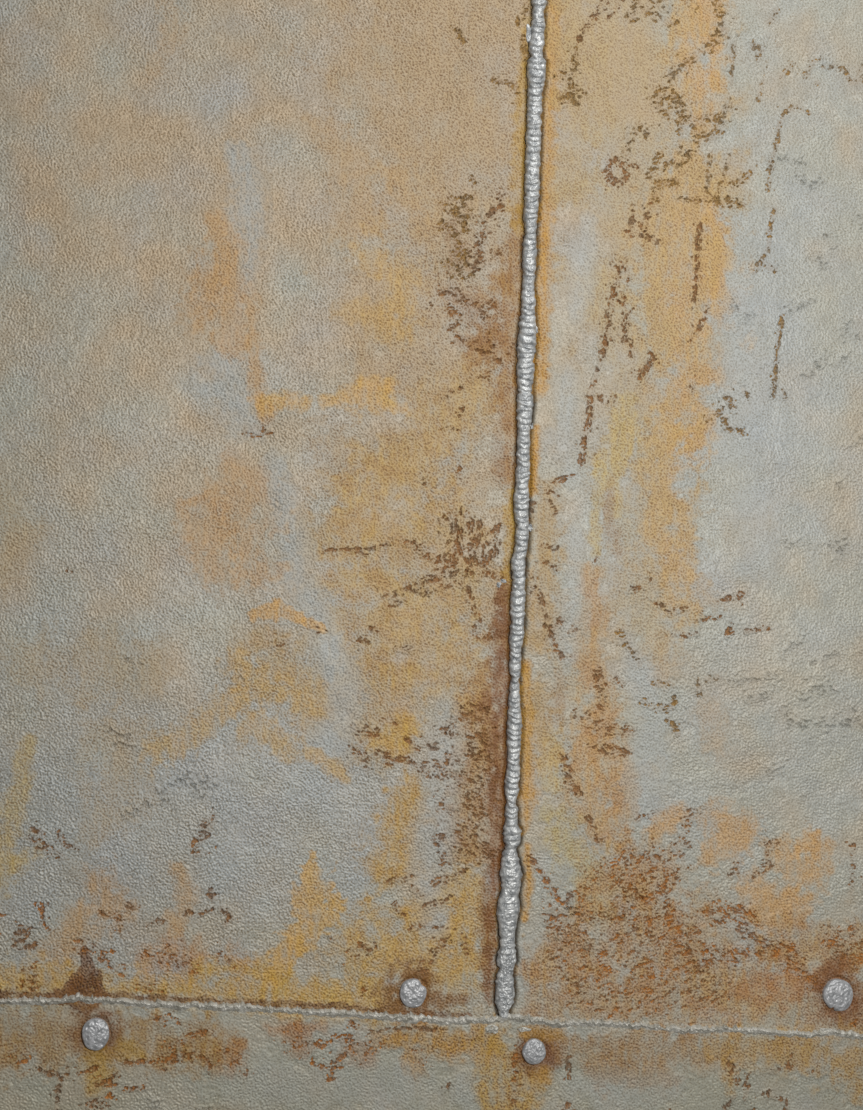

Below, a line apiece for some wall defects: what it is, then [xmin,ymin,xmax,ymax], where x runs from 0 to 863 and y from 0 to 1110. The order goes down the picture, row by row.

corrosion [0,0,533,1100]
corrosion [516,0,767,938]